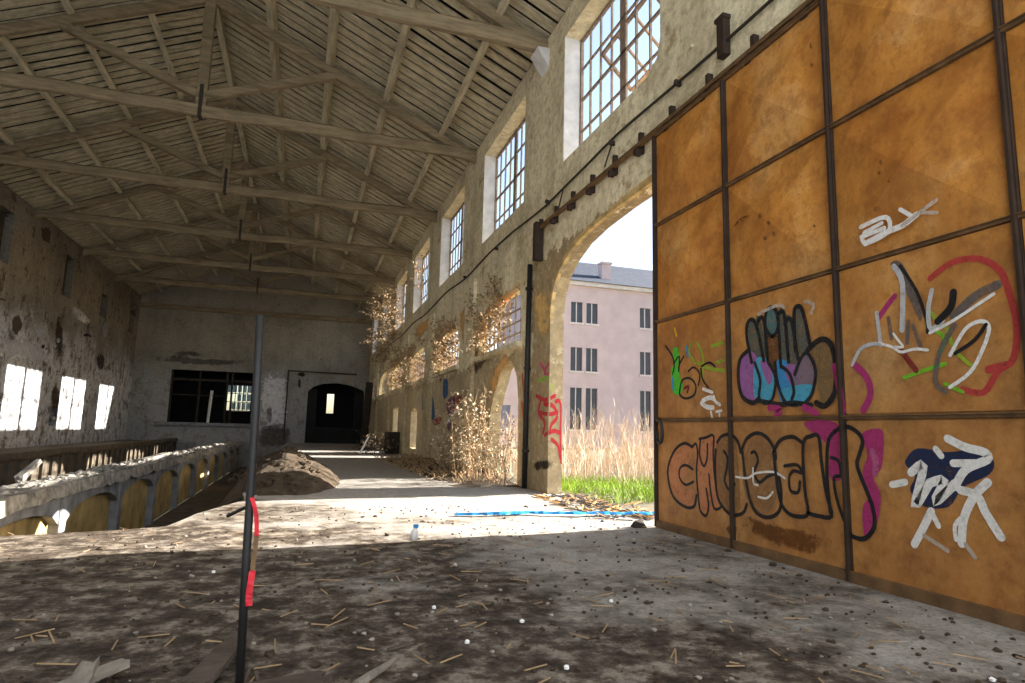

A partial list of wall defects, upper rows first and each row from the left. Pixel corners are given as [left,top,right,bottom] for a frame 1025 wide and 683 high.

flaking render [11,316,23,343]